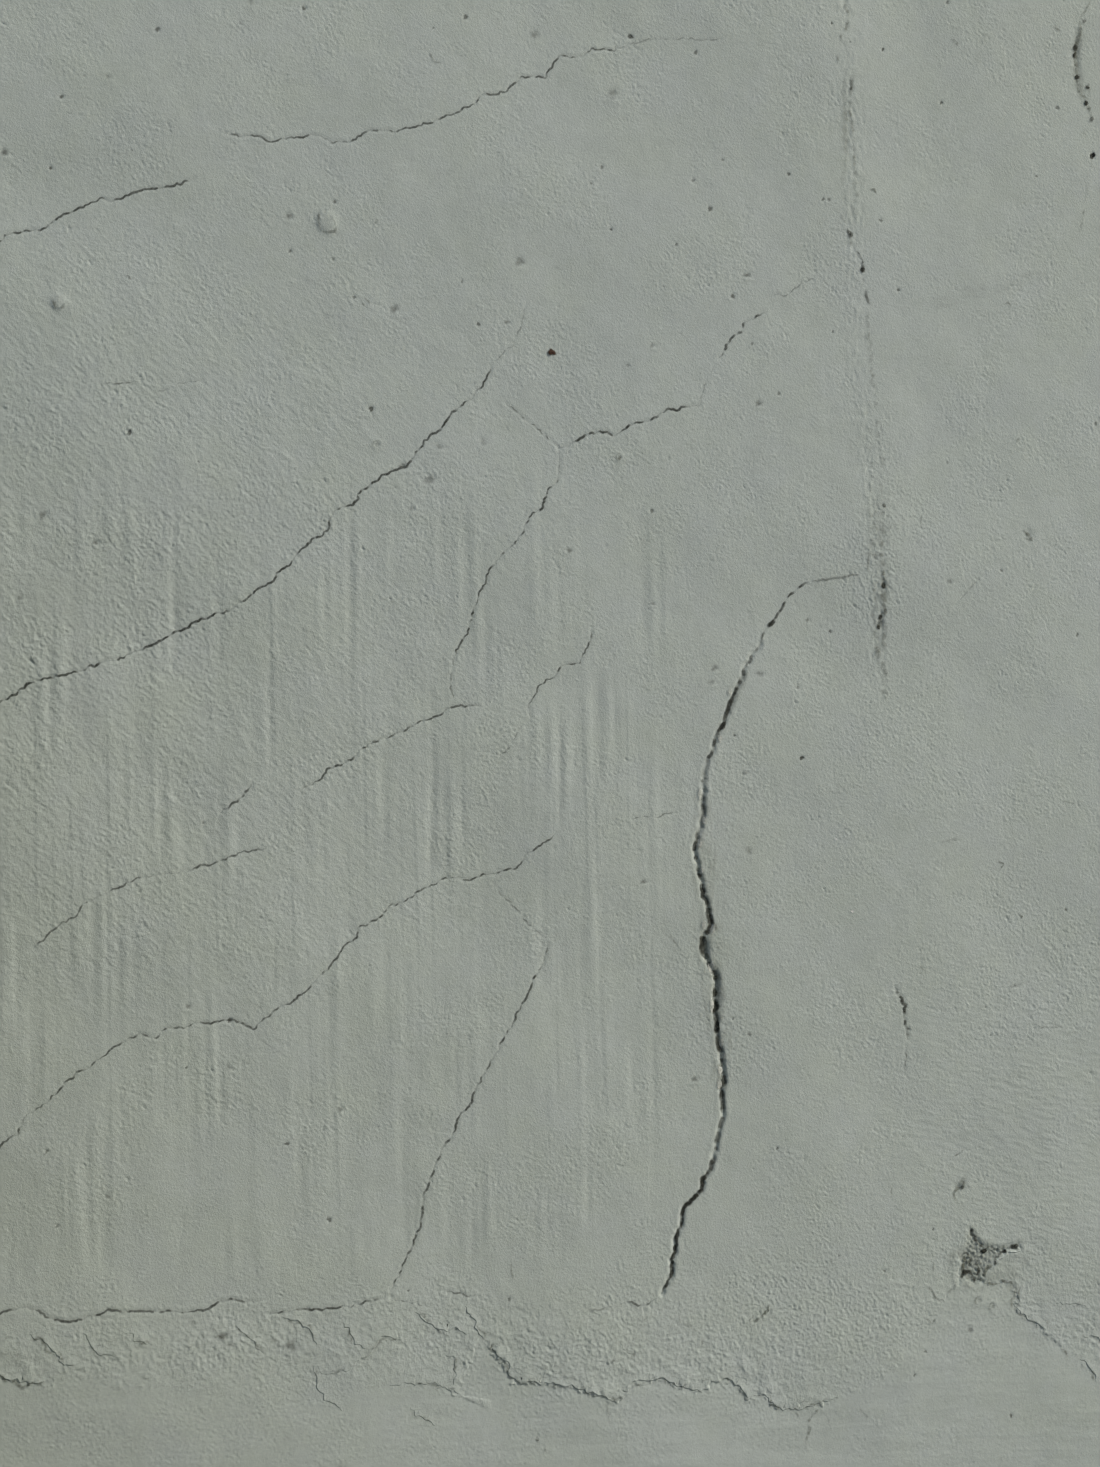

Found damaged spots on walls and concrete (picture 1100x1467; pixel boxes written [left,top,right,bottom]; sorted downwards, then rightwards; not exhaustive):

crack [1073,45,1090,105]
crack [14,180,186,234]
crack [577,406,685,441]
crack [7,373,489,700]
crack [455,487,550,651]
crack [631,585,802,1306]
crack [900,996,909,1029]
crack [280,975,536,1313]
spalling [962,1229,1021,1284]